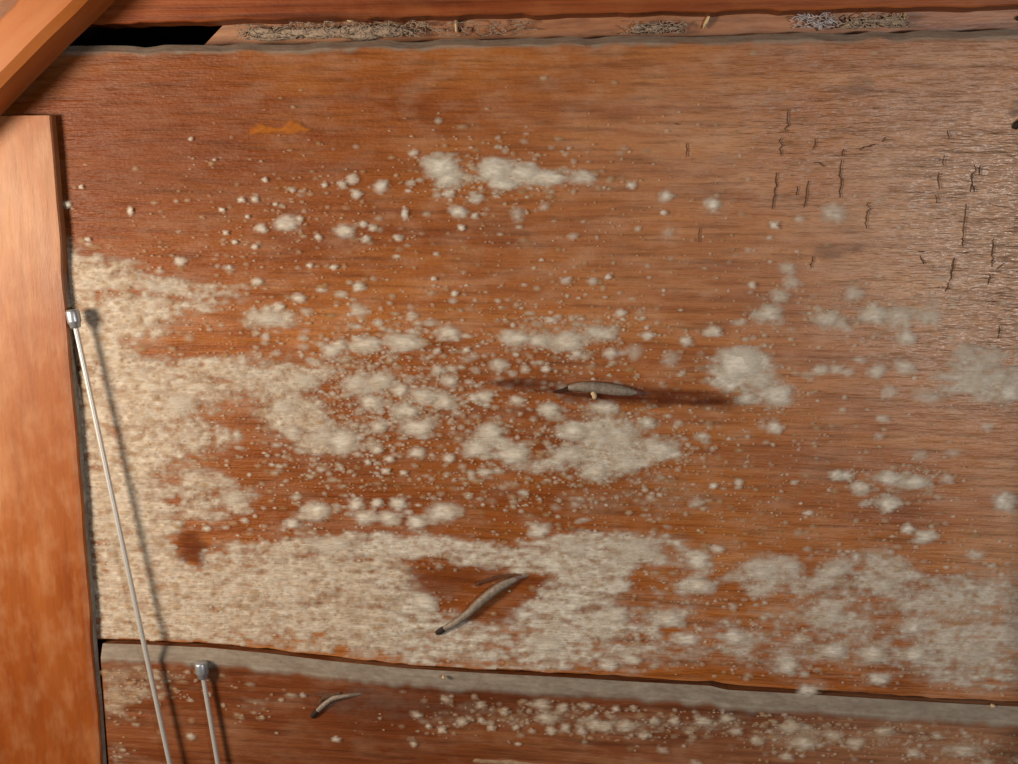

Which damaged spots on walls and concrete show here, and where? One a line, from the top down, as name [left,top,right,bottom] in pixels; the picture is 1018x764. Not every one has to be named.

leakage [245,187,310,233]
leakage [336,213,380,252]
leakage [320,169,420,218]
leakage [389,126,596,230]
crack [772,110,886,209]
crack [945,165,981,292]
crack [988,239,1004,285]
leakage [67,221,1018,696]
leakage [411,696,894,759]
leakage [902,726,1018,764]